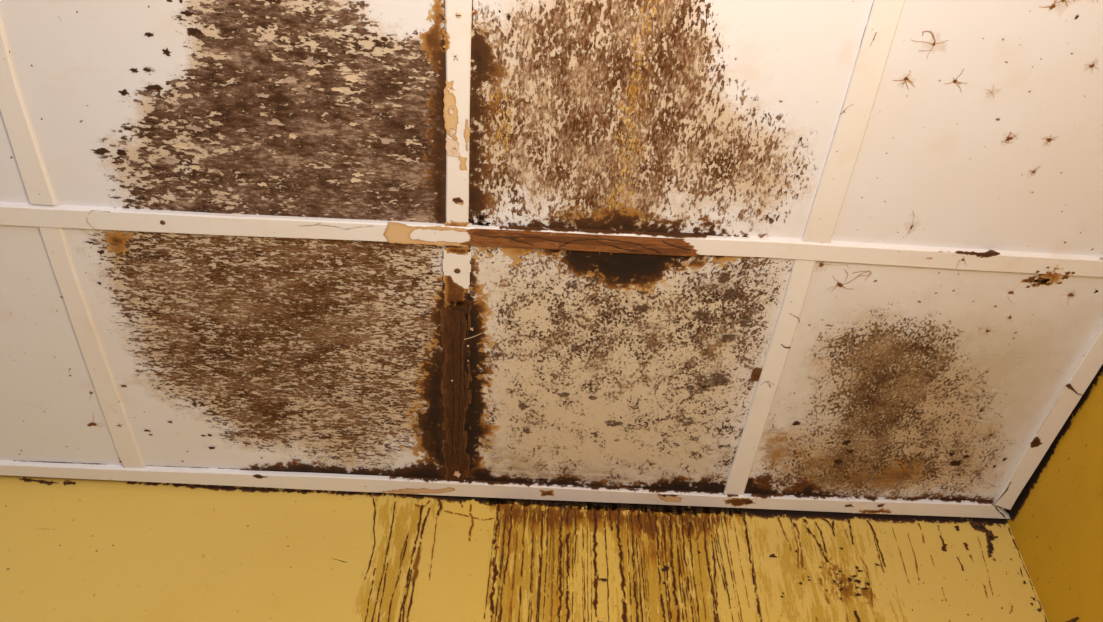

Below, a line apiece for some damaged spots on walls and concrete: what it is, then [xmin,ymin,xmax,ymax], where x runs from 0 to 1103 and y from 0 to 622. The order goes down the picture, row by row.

peeling [442,16,450,52]
leakage [90,0,446,224]
peeling [443,81,470,170]
leakage [468,0,816,238]
peeling [383,222,708,309]
leakage [86,230,1103,622]
peeling [967,519,998,561]